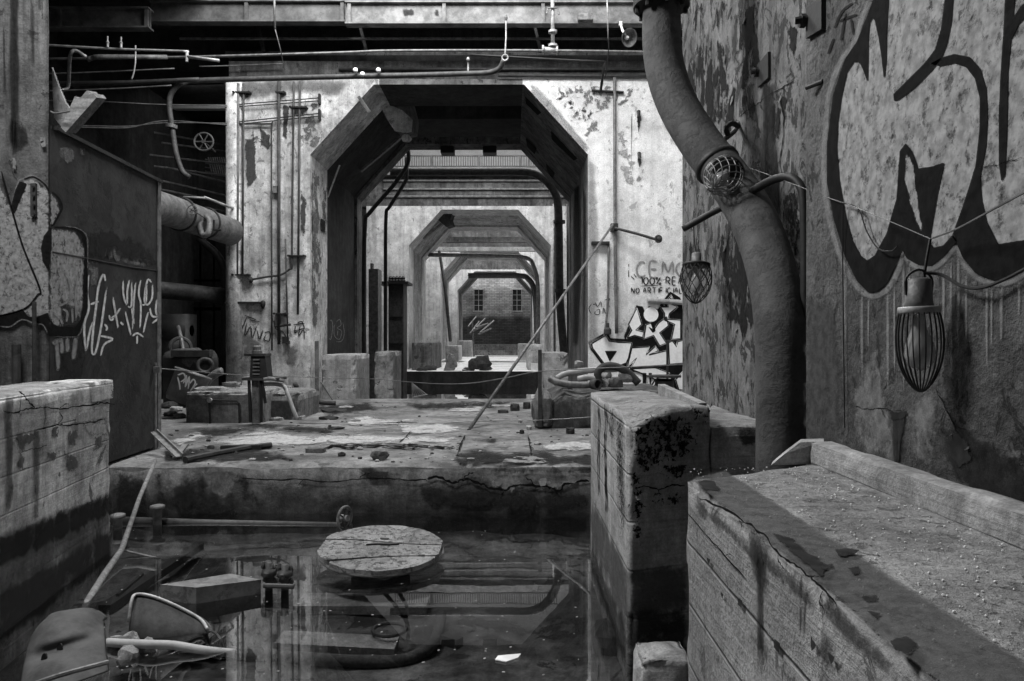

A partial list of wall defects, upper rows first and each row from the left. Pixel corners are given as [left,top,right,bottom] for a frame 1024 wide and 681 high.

peeling [551,82,644,187]
crack [4,391,110,471]
crack [244,404,611,512]
leakage [405,401,510,411]
leakage [0,398,459,640]
crack [636,484,837,609]